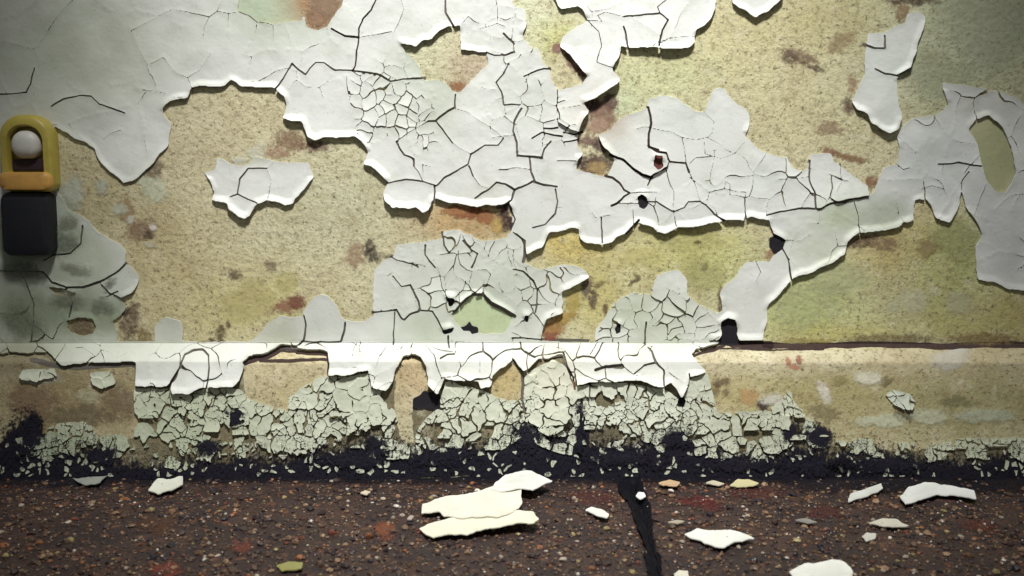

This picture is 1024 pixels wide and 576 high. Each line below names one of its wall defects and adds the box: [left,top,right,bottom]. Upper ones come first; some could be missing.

rust [308,0,338,27]
crack [275,0,426,95]
crack [230,163,273,204]
flaking render [0,0,1024,460]
crack [371,0,1024,413]
crack [0,225,138,388]
crack [170,349,211,389]
crack [243,315,353,376]
peeling [164,456,194,477]
damp [0,398,1024,479]
peeling [1001,460,1024,476]
crack [618,477,663,576]